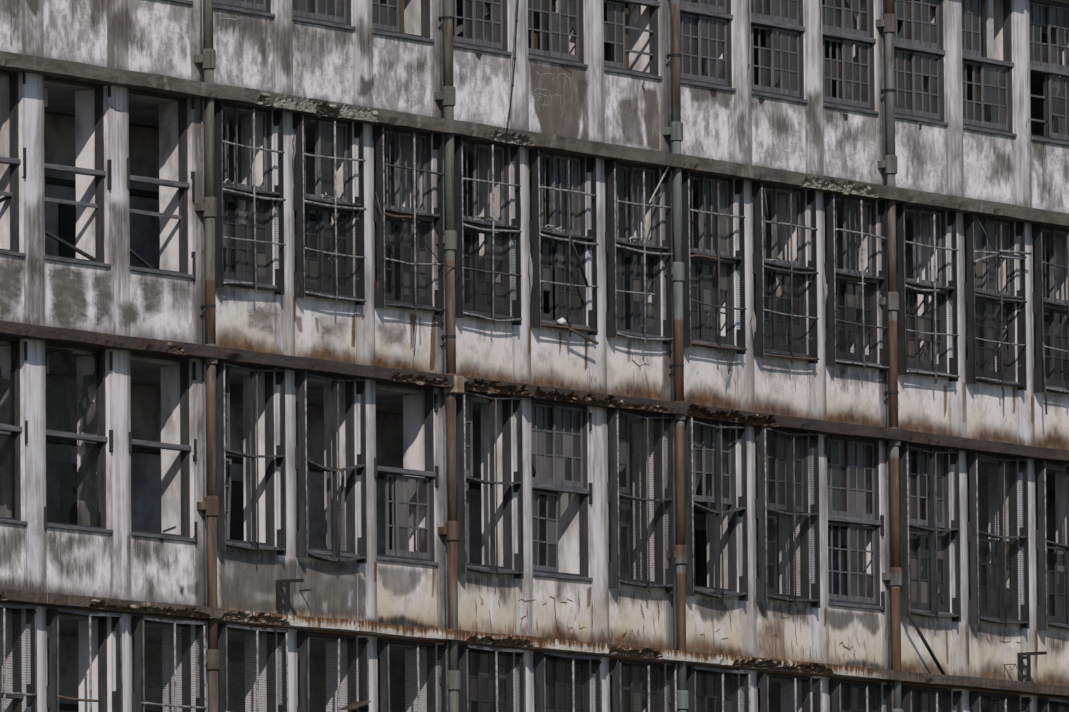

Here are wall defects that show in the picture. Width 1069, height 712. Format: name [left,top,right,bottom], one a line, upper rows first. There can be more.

damp [91,0,104,28]
damp [217,13,372,74]
damp [533,72,589,140]
corrosion [306,316,355,364]
corrosion [379,314,415,347]
corrosion [371,356,417,371]
corrosion [979,430,1022,445]
corrosion [1035,430,1069,449]
damp [46,534,91,577]
damp [134,538,169,569]
damp [755,602,808,623]
corrosion [545,624,579,641]